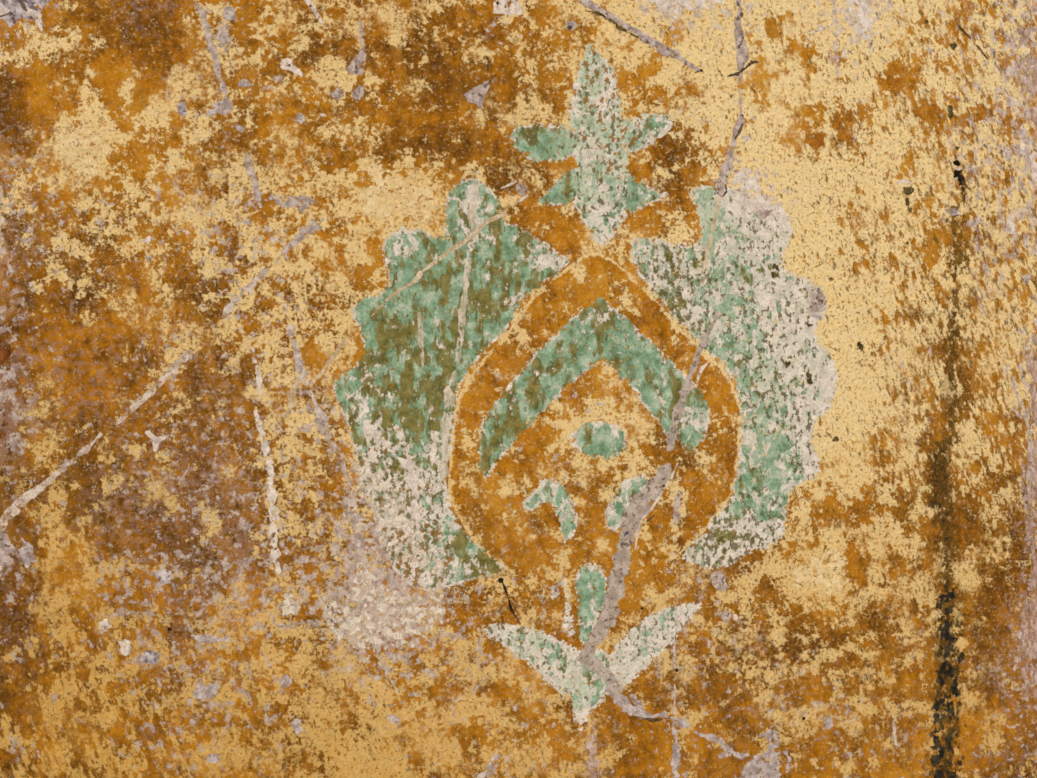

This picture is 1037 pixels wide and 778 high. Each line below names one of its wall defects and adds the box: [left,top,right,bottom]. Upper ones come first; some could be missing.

flaking render [0,0,52,32]
leakage [922,146,977,778]
crack [604,584,750,778]
flaking render [734,728,792,778]